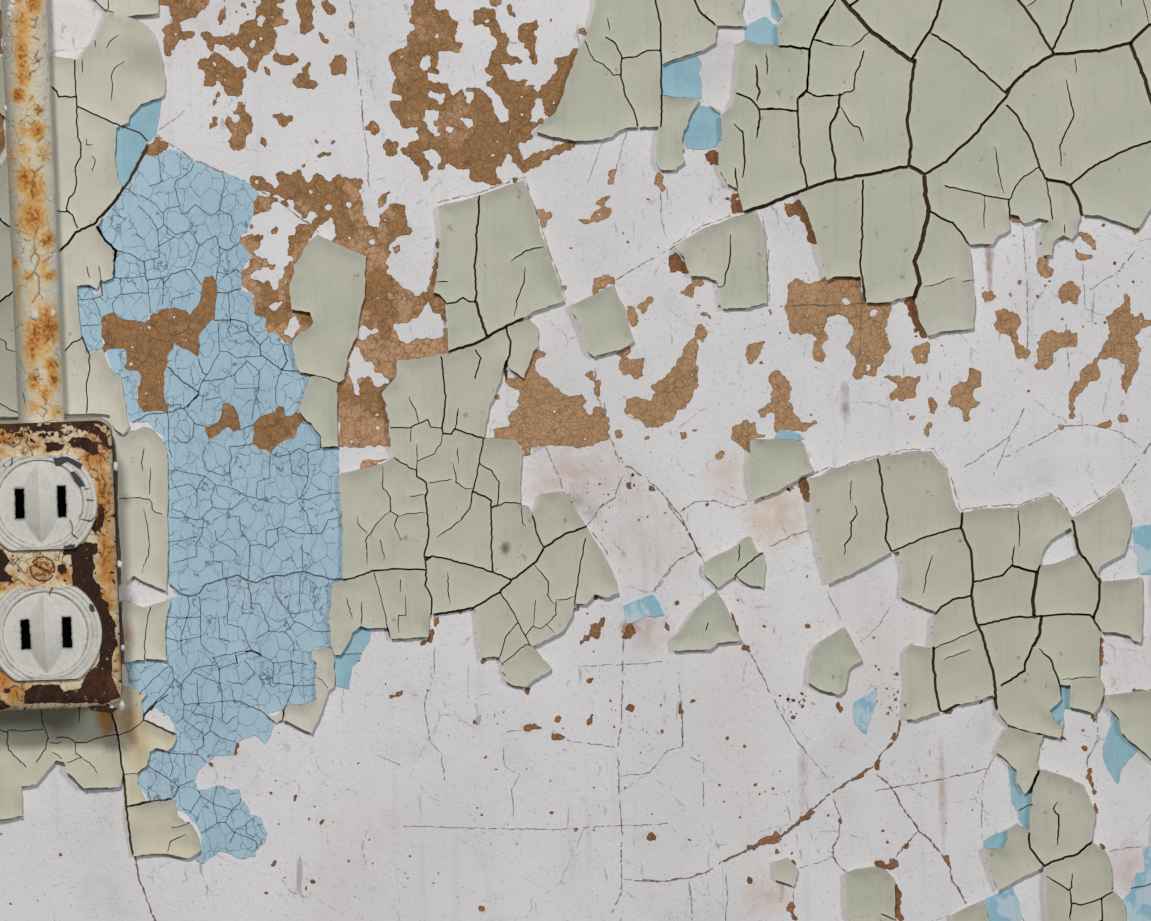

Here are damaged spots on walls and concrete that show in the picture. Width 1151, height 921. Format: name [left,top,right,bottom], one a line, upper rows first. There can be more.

peeling [198,0,299,151]
peeling [295,0,336,44]
crack [350,2,370,190]
peeling [518,19,539,65]
crack [585,0,663,184]
crack [616,0,1151,367]
peeling [571,274,654,379]
peeling [623,304,711,440]
peeling [994,285,1151,430]
crack [0,36,808,921]
peeling [614,536,766,652]
peeling [731,341,1151,921]